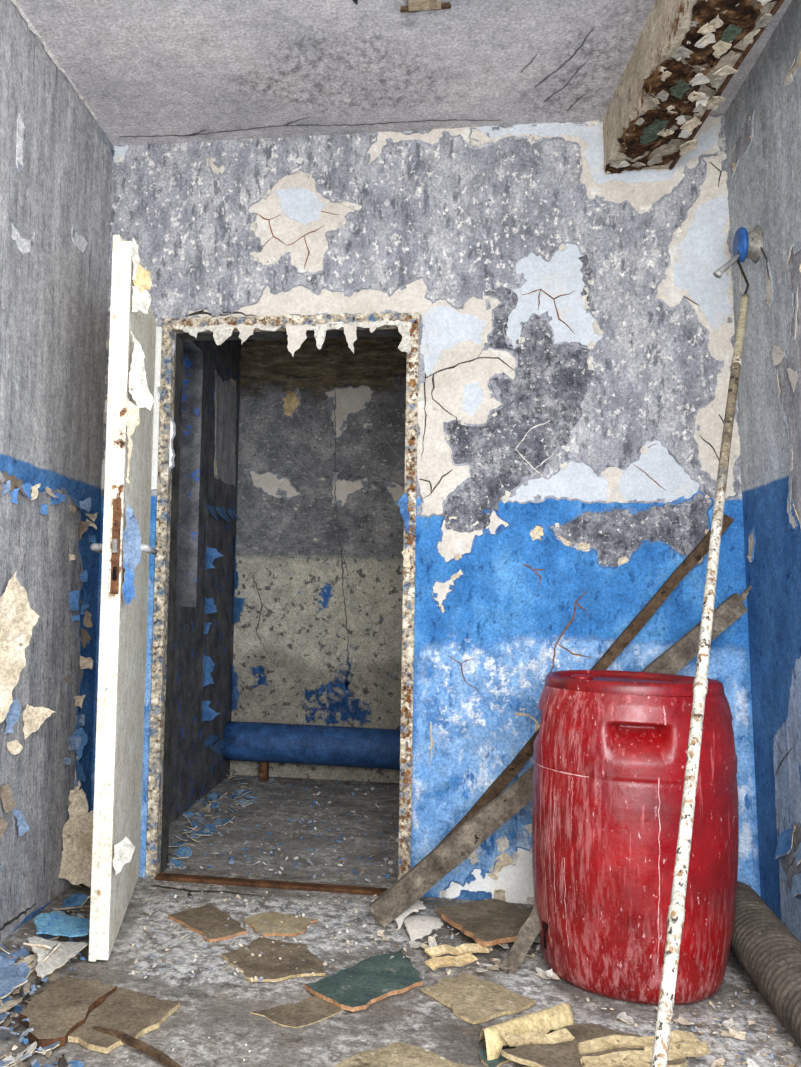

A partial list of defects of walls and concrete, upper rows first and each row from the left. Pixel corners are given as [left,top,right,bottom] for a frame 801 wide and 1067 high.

peeling [131,237,152,314]
peeling [122,324,176,606]
corrosion [393,316,419,393]
corrosion [403,434,416,577]
peeling [183,0,784,613]
peeling [772,241,801,531]
peeling [0,469,102,942]
peeling [112,836,135,876]
peeling [201,505,245,754]
corrosion [399,680,413,873]
peeling [775,821,801,899]
peeling [0,936,88,999]